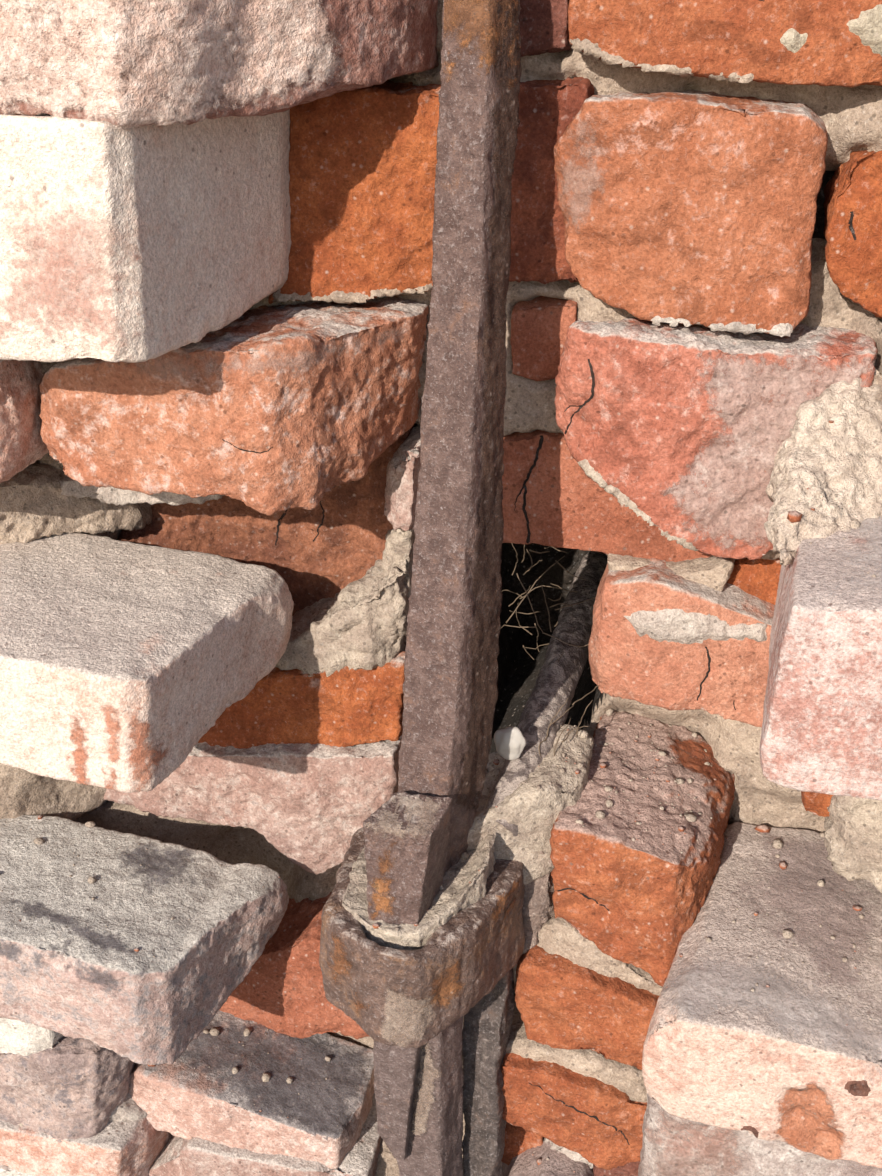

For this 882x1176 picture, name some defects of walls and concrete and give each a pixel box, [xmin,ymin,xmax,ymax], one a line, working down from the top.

rust [443,0,522,812]
crack [514,359,595,544]
crack [275,509,288,545]
crack [313,501,324,542]
crack [697,647,711,701]
rust [371,842,397,919]
crack [529,1083,629,1145]